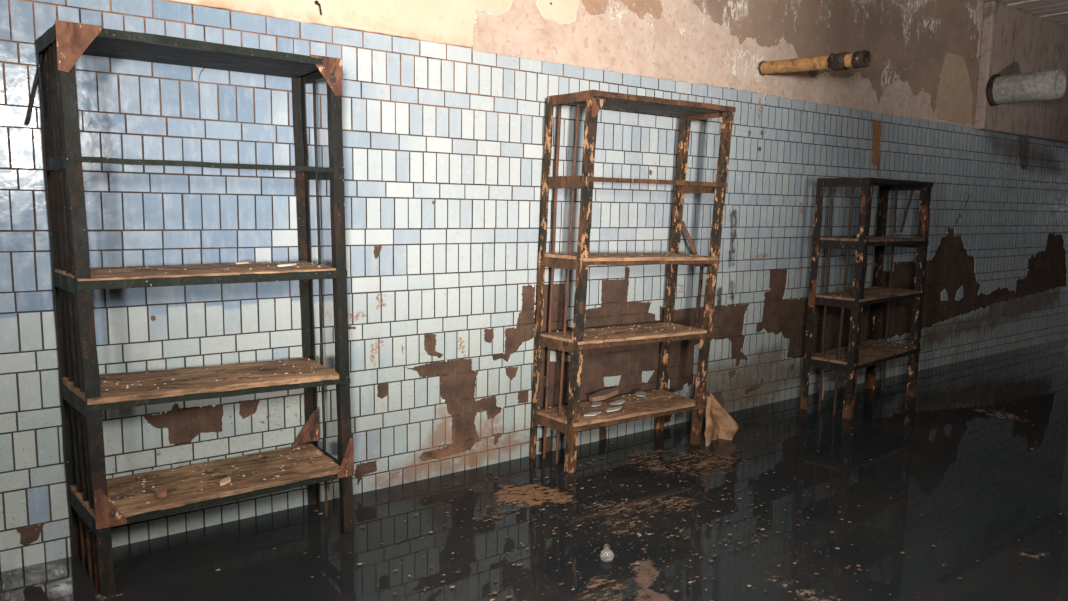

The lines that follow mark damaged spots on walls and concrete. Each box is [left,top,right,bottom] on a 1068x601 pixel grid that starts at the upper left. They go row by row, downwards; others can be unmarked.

peeling [472,0,973,127]
corrosion [873,120,881,175]
peeling [483,227,1068,440]
peeling [140,403,224,446]
peeling [237,397,261,419]
peeling [401,332,503,461]
peeling [538,435,553,452]
peeling [354,458,378,485]